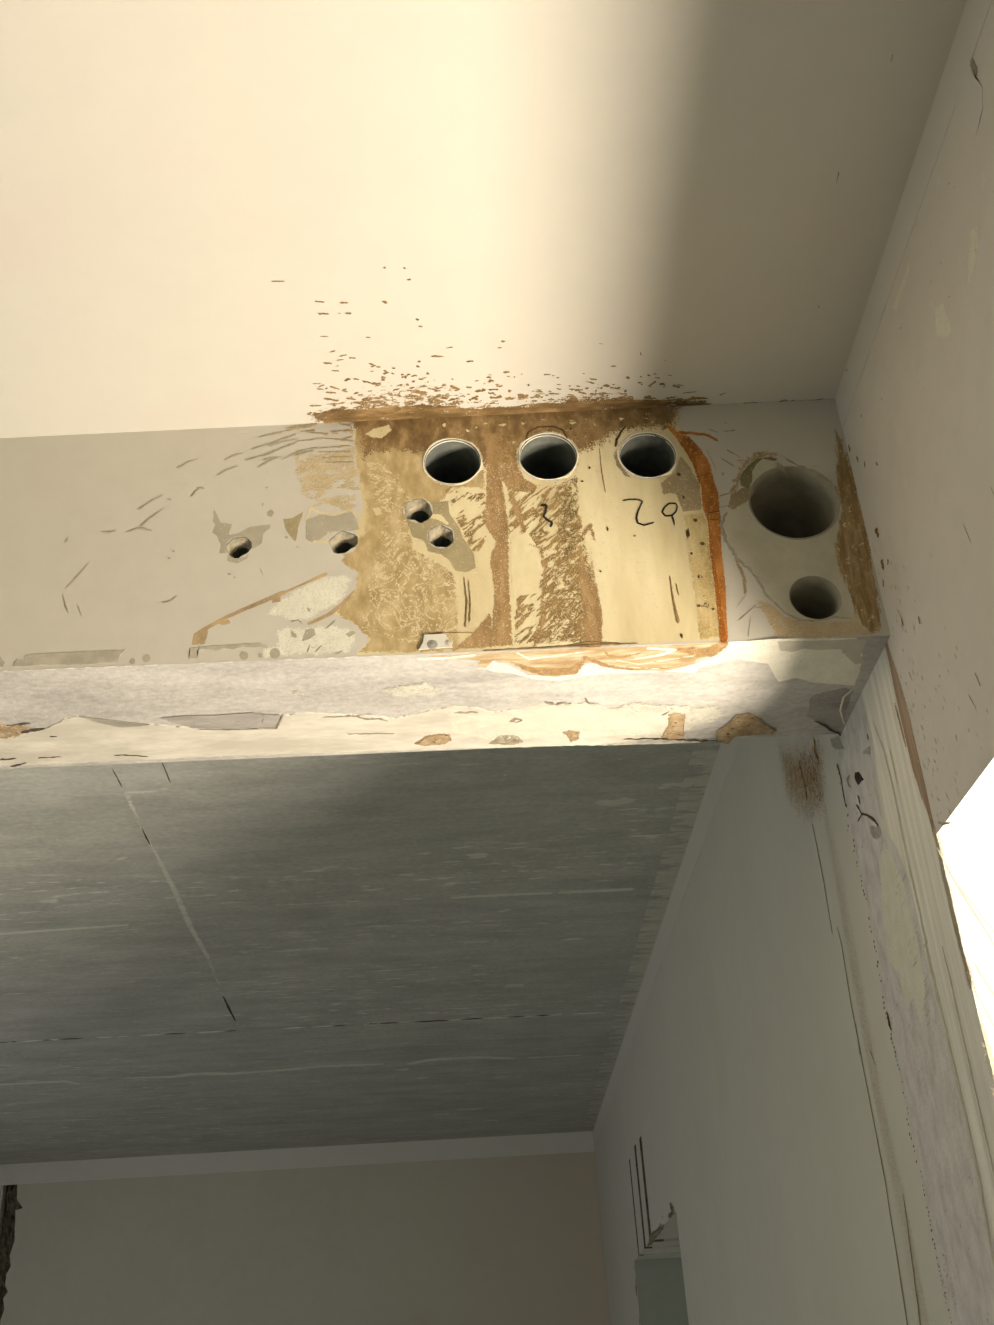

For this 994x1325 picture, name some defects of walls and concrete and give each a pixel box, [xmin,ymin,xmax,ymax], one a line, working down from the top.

spalling [423,438,483,485]
spalling [518,432,579,480]
spalling [614,432,678,478]
corrosion [260,336,743,655]
peeling [212,487,361,578]
peeling [404,500,476,572]
peeling [189,643,280,660]
crack [0,736,57,767]
peeling [0,703,777,766]
crack [0,755,238,1043]
crack [282,1012,604,1029]